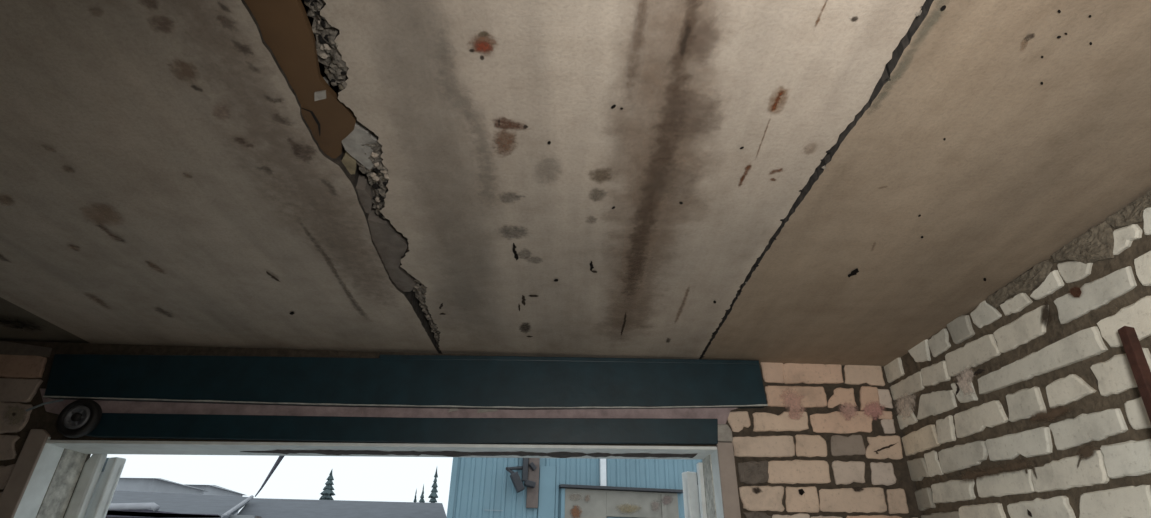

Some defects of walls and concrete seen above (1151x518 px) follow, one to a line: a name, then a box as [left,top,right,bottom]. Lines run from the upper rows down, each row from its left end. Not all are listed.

spalling [304,0,348,90]
corrosion [470,32,496,60]
corrosion [770,89,786,112]
spalling [356,141,390,219]
water stain [591,170,610,201]
water stain [614,0,698,335]
spalling [413,278,445,351]